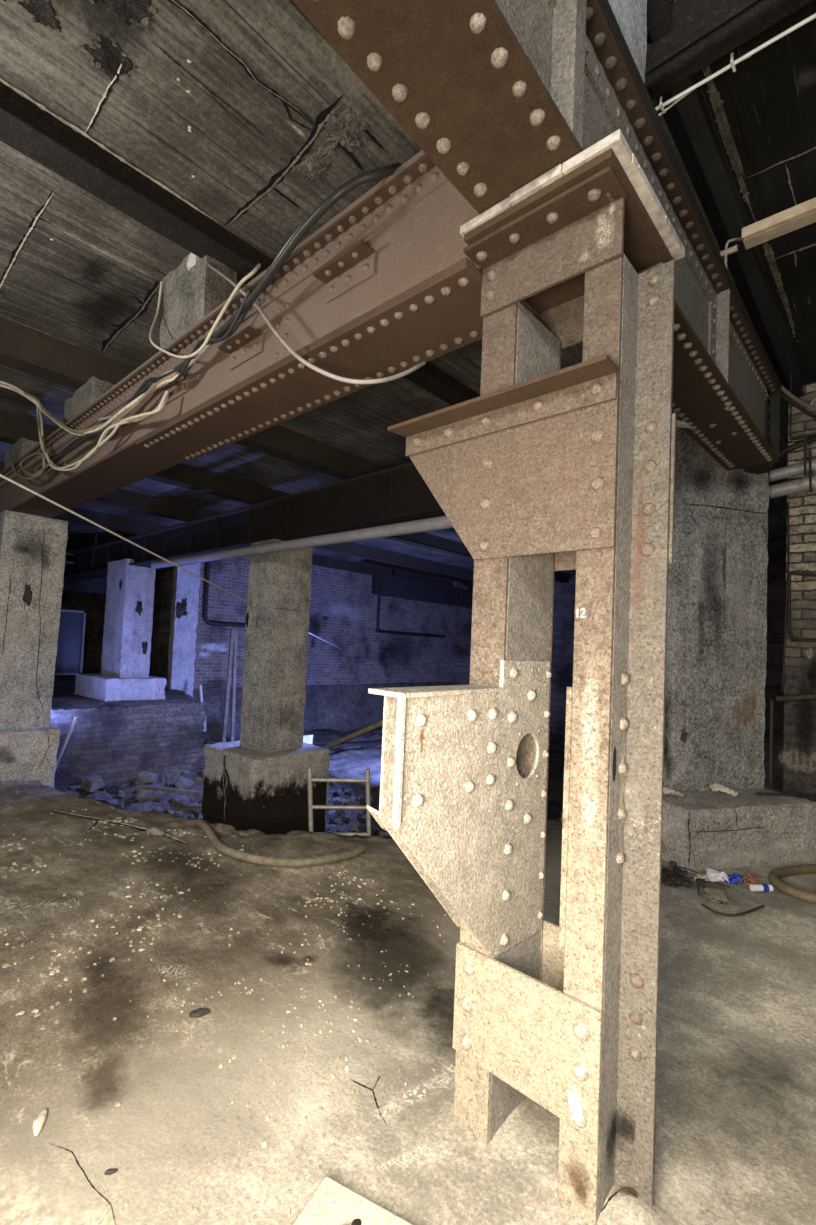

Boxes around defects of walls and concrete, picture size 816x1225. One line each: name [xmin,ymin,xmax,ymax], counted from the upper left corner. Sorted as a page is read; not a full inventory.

spalling [3,0,61,34]
spalling [79,33,137,83]
crack [85,64,122,134]
crack [148,0,387,227]
spalling [291,106,370,182]
crack [0,191,54,296]
spalling [22,584,32,606]
leakage [202,777,327,835]
leakage [90,962,134,1031]
leakage [345,911,454,1033]
leakage [607,1115,634,1158]
crack [50,1143,116,1225]